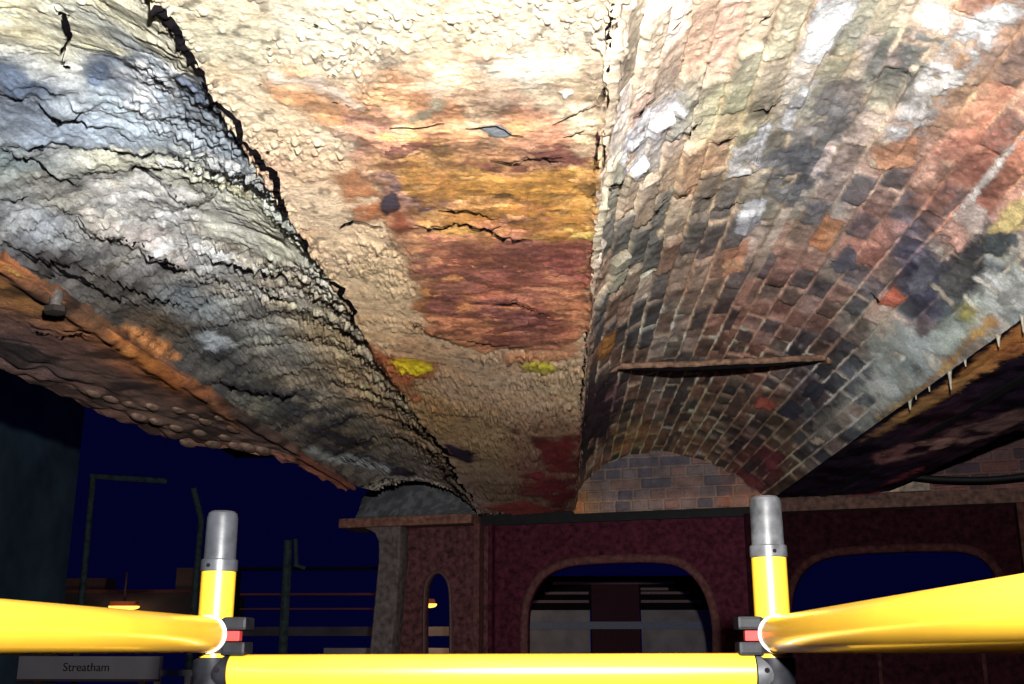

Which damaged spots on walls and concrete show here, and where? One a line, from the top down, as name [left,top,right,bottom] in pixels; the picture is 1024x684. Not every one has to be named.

crack [2,5,474,501]
corrosion [338,170,383,221]
spalling [260,37,605,353]
crack [418,210,531,242]
crack [389,3,637,201]
damp [621,90,688,178]
damp [726,81,814,178]
damp [797,0,858,64]
damp [868,0,1024,171]
crack [576,268,630,480]